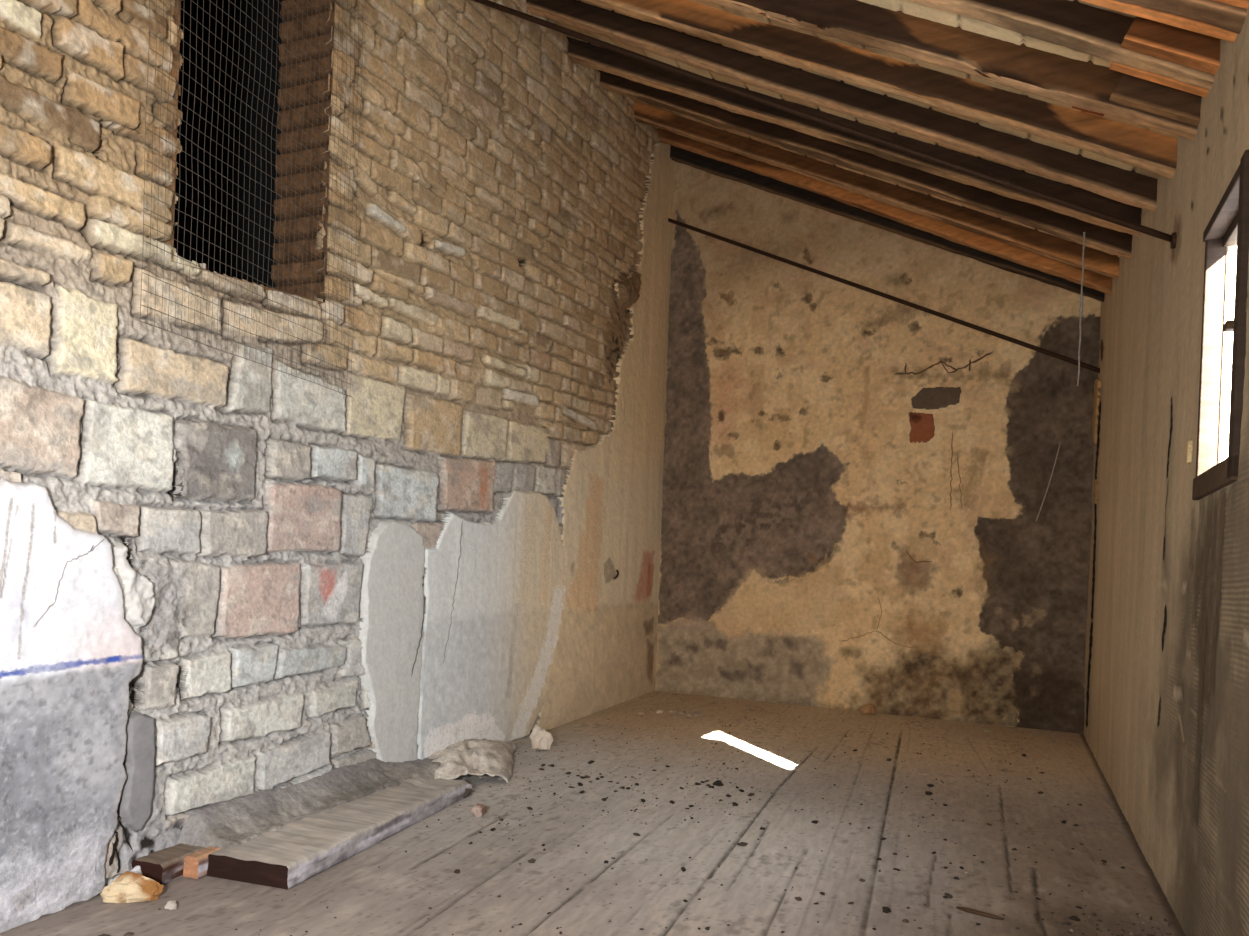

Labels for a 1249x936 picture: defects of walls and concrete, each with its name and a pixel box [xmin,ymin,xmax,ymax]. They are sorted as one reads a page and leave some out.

flaking render [907,303,953,364]
crack [35,538,105,626]
peeling [0,453,198,856]
peeling [313,564,348,622]
peeling [417,143,853,760]
leakage [655,528,1085,734]
flaking render [918,530,941,547]
spalling [951,313,1101,667]